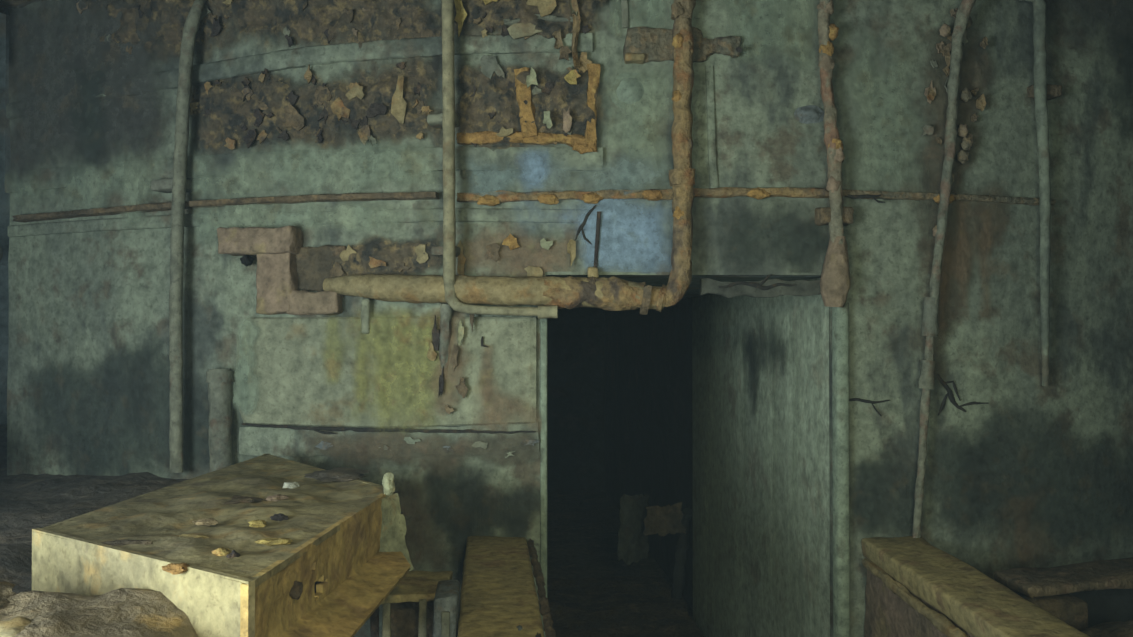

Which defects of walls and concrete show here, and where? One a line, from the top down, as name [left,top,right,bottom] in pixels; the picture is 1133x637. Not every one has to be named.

rust [76,0,606,57]
rust [189,56,441,152]
rust [455,52,600,149]
crack [575,205,597,245]
rust [920,30,1006,340]
water stain [36,351,209,475]
peeling [427,314,475,414]
crack [849,398,890,416]
crack [937,374,988,416]
water stain [736,307,830,637]
water stain [851,458,916,535]
water stain [938,410,1133,546]